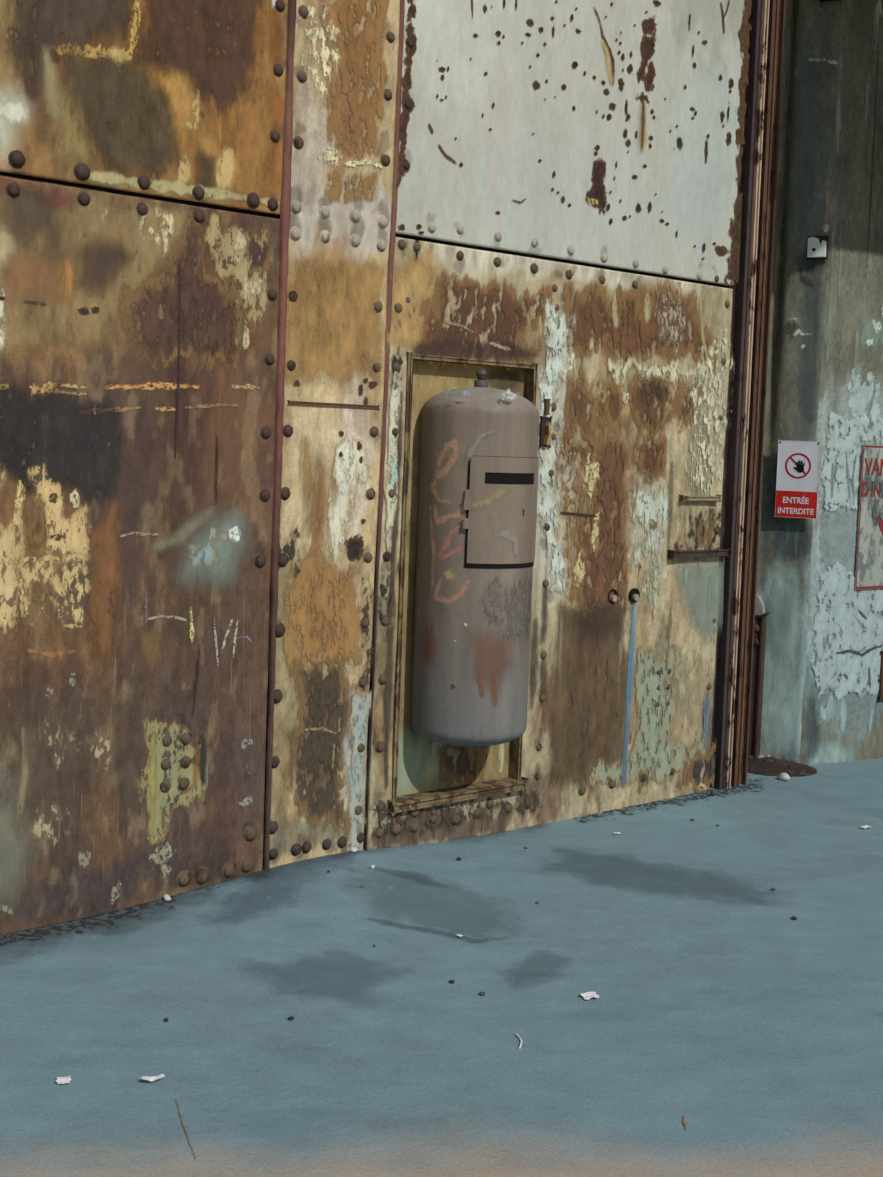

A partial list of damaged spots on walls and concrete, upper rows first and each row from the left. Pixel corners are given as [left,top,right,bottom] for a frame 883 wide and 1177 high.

peeling [0,93,28,150]
corrosion [0,0,275,199]
peeling [301,0,342,98]
corrosion [396,0,417,187]
corrosion [586,144,610,215]
corrosion [636,15,657,151]
corrosion [715,0,752,286]
corrosion [283,260,725,836]
peeling [536,298,576,596]
peeling [607,329,733,608]
flaking render [808,365,883,733]
peeling [138,718,206,878]